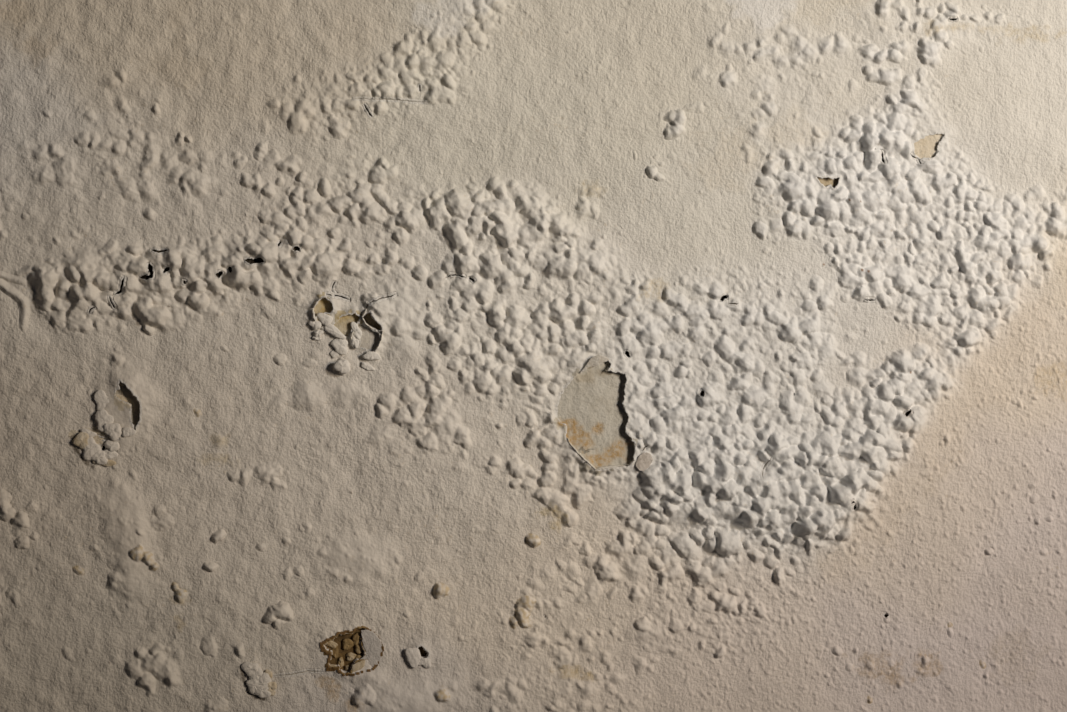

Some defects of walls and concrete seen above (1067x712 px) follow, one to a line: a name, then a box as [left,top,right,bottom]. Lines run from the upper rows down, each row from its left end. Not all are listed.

peeling [813,174,844,192]
peeling [910,131,948,162]
peeling [297,292,386,374]
peeling [68,377,143,471]
peeling [553,355,638,484]
peeling [310,615,384,688]